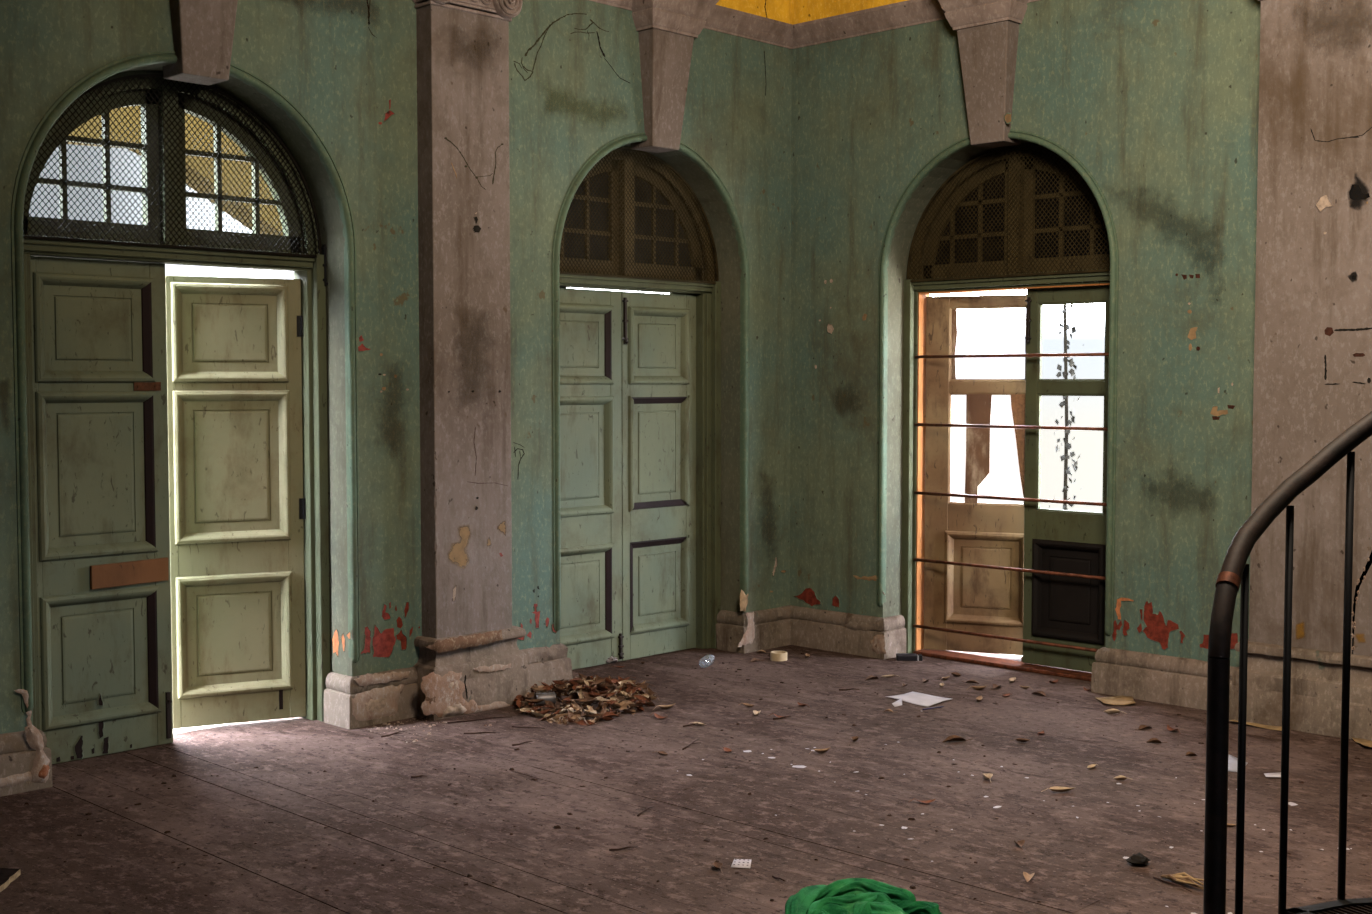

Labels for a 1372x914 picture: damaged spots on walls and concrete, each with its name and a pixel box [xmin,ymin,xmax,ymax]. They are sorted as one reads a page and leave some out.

spalling [448,525,471,568]
flaking render [332,601,511,721]
flaking render [425,586,558,653]
peeling [1111,596,1209,651]
crack [1351,551,1372,654]
flaking render [0,689,110,788]